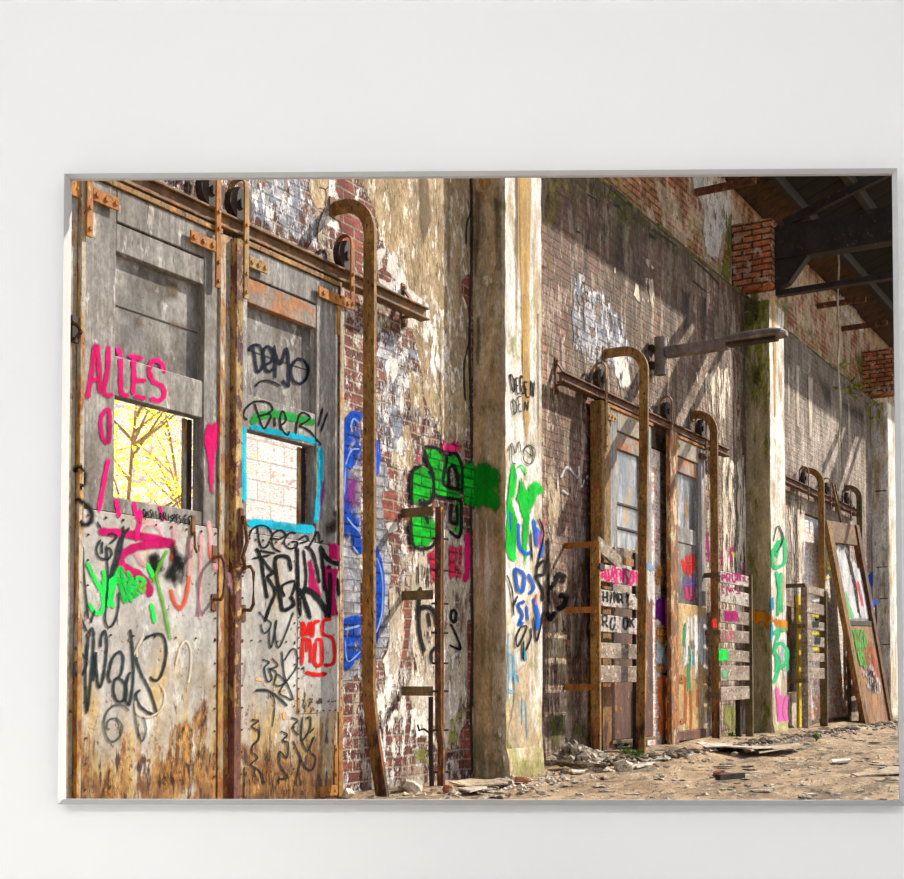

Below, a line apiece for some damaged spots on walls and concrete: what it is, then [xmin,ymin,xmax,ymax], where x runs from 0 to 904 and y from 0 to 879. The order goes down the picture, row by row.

flaking render [634,257,655,308]
peeling [571,272,631,387]
peeling [251,178,491,768]
rust [104,770,115,797]
rust [156,701,208,789]
rust [241,757,319,799]